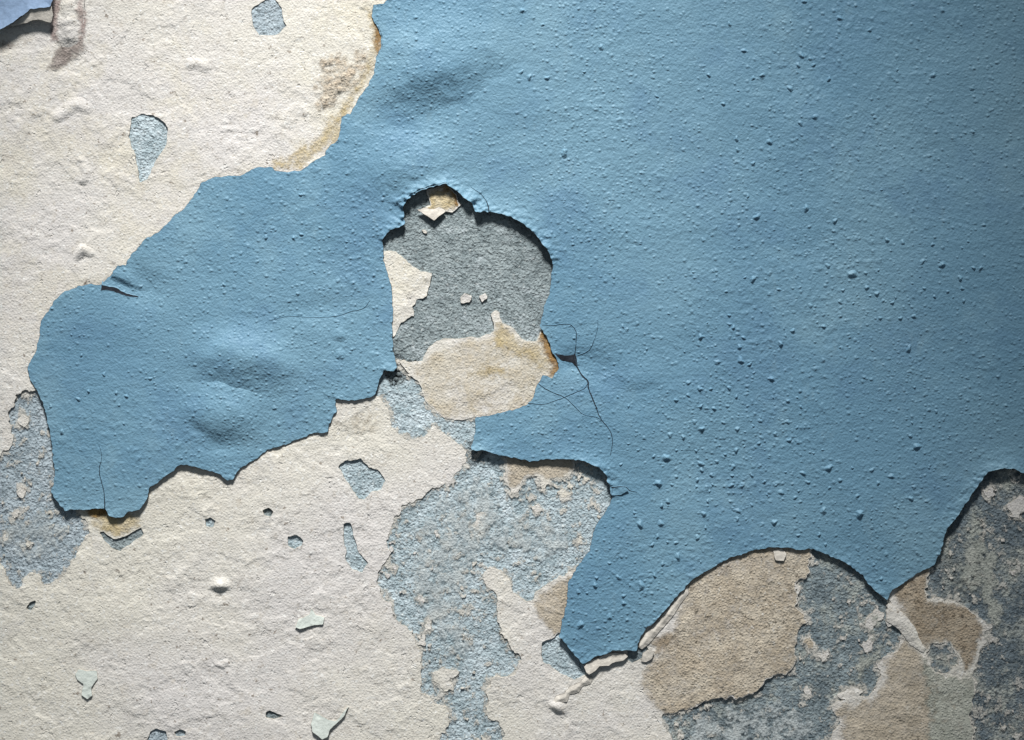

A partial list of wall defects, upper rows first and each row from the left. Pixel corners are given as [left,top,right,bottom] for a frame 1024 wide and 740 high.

peeling [0,0,53,29]
spalling [251,0,286,36]
spalling [129,114,168,182]
crack [528,323,613,456]
peeling [0,390,144,589]
spalling [339,459,385,500]
peeling [375,184,612,740]
peeling [662,548,902,740]
peeling [925,468,1024,740]